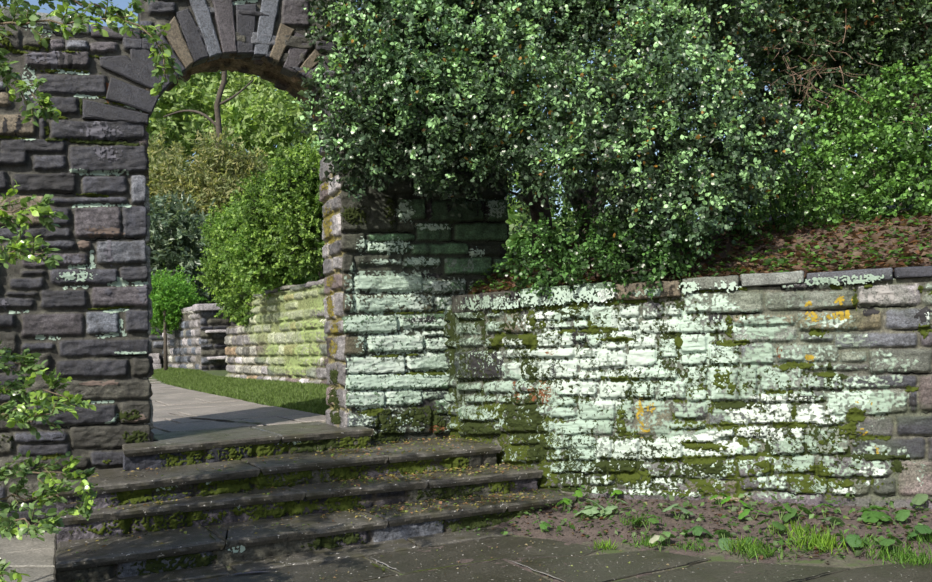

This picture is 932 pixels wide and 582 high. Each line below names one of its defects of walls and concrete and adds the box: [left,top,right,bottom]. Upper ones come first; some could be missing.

water stain [859,283,895,316]
water stain [913,283,932,323]
water stain [571,330,587,348]
water stain [465,343,504,387]
water stain [417,397,444,416]